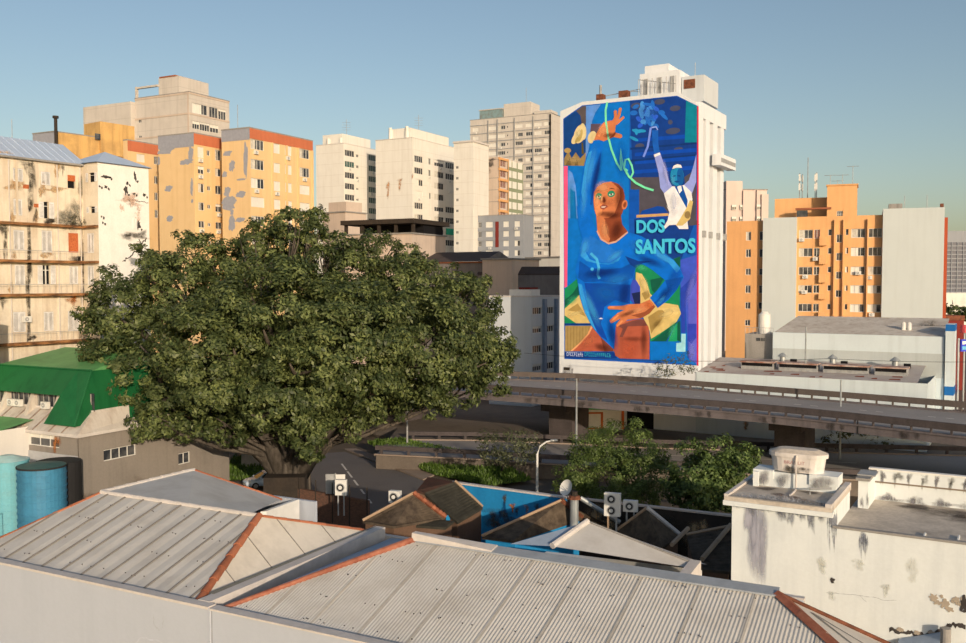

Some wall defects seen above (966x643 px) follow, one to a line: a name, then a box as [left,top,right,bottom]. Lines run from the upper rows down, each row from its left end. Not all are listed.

flaking render [120,171,148,209]
peeling [180,147,193,165]
peeling [221,142,248,231]
water stain [26,232,36,342]
water stain [737,467,837,574]
flaking render [889,594,966,636]